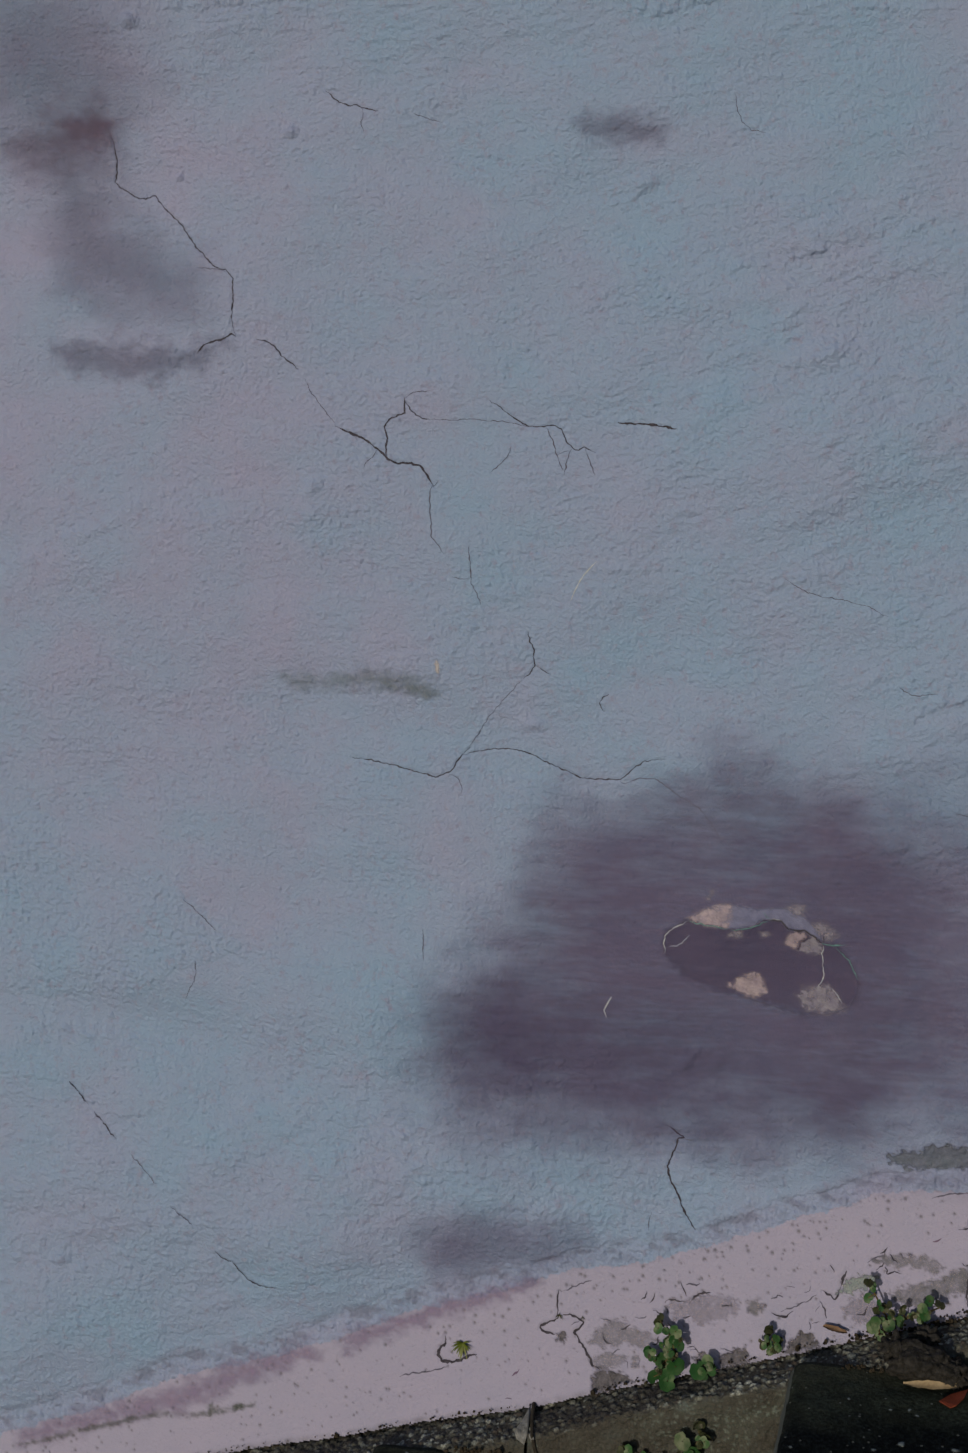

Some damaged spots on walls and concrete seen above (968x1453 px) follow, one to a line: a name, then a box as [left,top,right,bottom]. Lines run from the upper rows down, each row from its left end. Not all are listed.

crack [108,129,594,605]
crack [618,421,676,429]
peeling [663,892,858,1017]